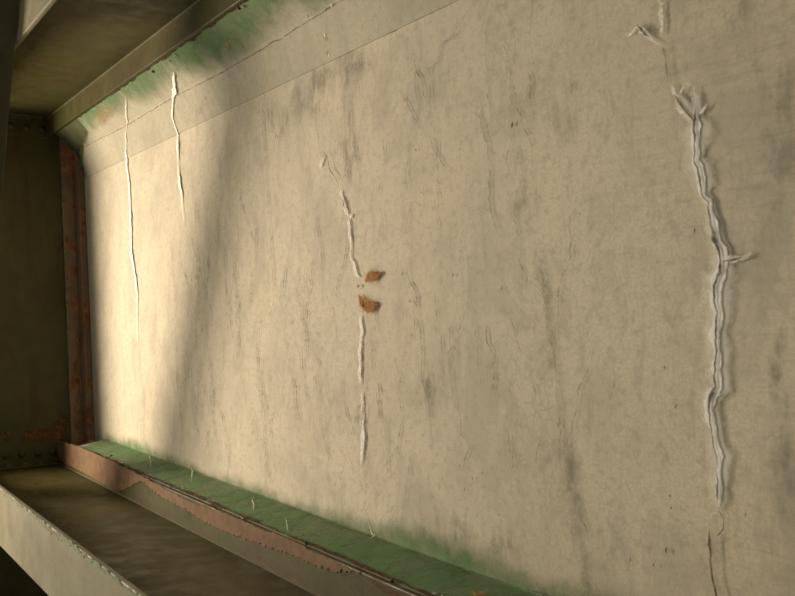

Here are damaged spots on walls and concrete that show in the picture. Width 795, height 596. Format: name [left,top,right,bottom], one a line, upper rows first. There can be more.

crack [125,100,137,317]
crack [171,73,400,463]
rust [357,271,381,313]
crack [627,0,751,596]
rust [0,490,139,596]